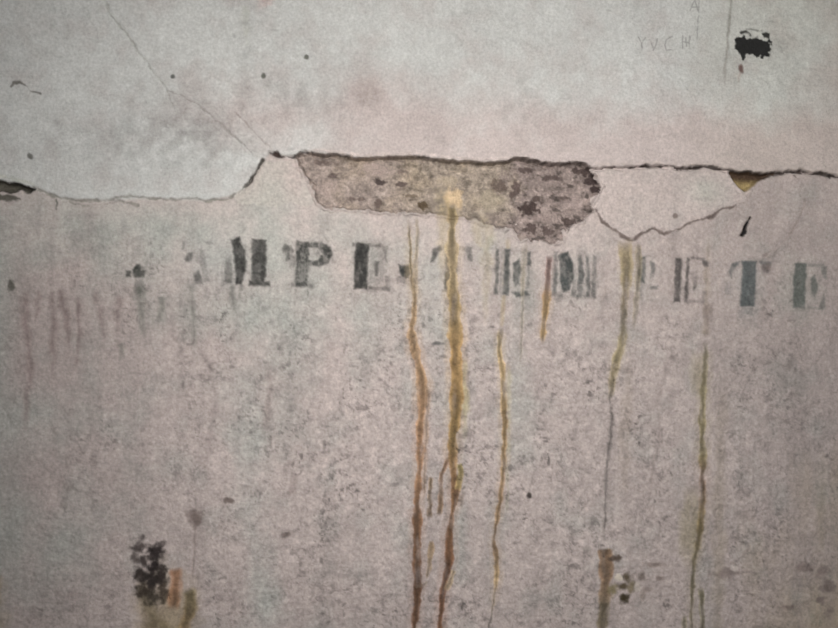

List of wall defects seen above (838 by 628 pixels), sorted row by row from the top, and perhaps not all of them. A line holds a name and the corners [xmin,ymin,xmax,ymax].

crack [9,79,43,96]
crack [35,0,302,211]
flaking render [0,173,38,204]
flaking render [234,147,776,245]
crack [562,159,838,180]
rust [535,255,559,347]
rust [400,185,529,628]
water stain [719,433,838,628]